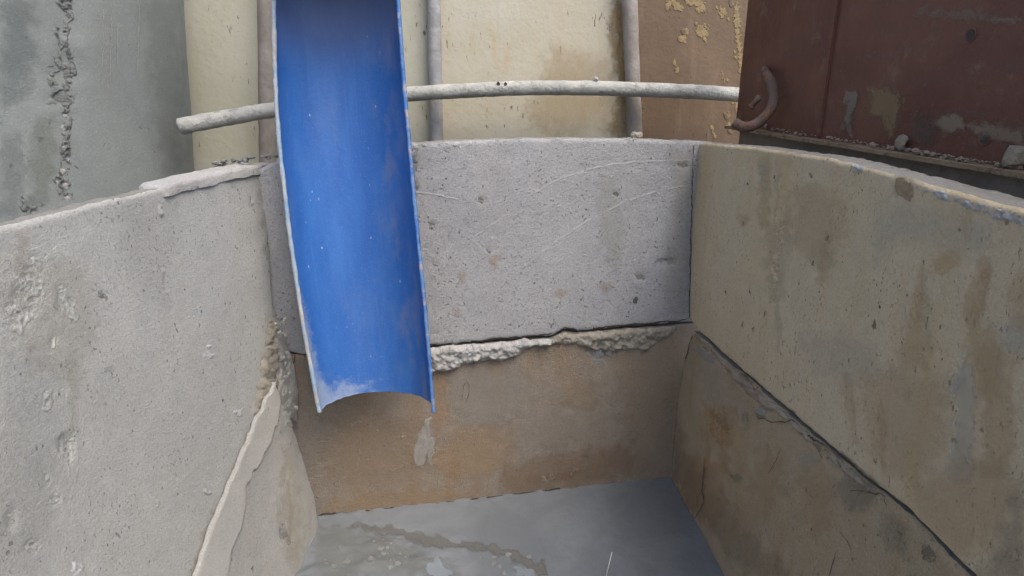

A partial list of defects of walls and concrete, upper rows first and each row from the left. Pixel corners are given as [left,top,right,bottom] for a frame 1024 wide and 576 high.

peeling [665,0,743,73]
spalling [46,0,78,205]
crack [430,146,694,360]
water stain [414,417,434,466]
crack [757,410,887,506]